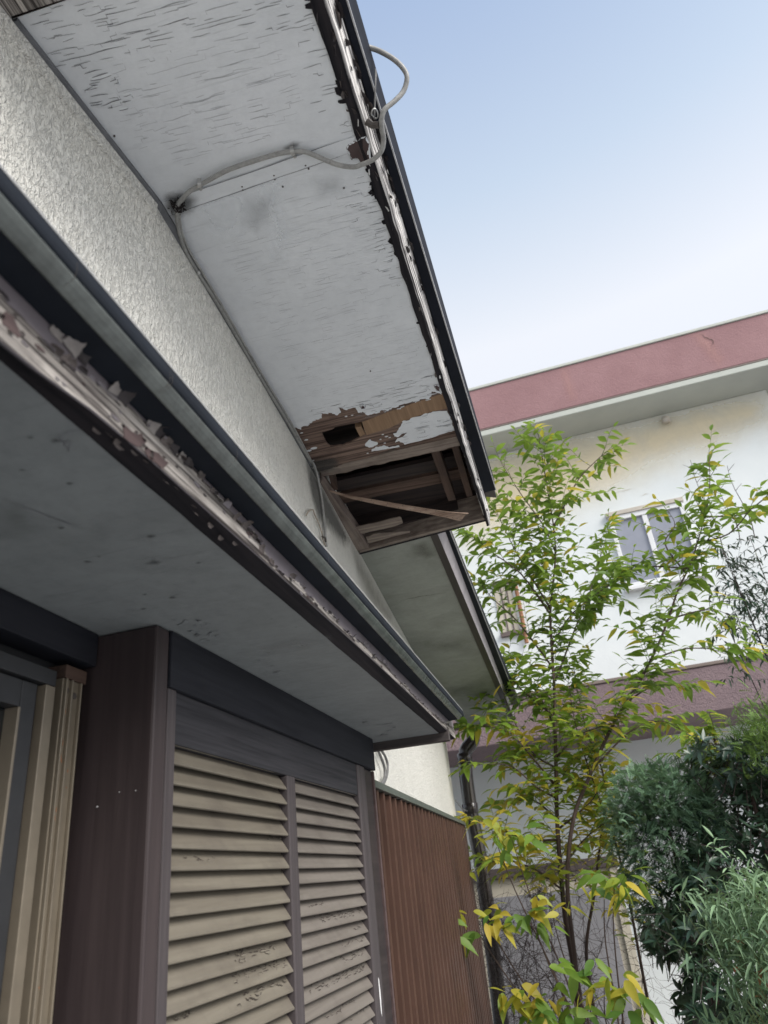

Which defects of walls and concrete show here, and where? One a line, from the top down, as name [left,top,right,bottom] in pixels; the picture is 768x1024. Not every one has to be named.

peeling [305,0,425,294]
peeling [0,289,472,739]